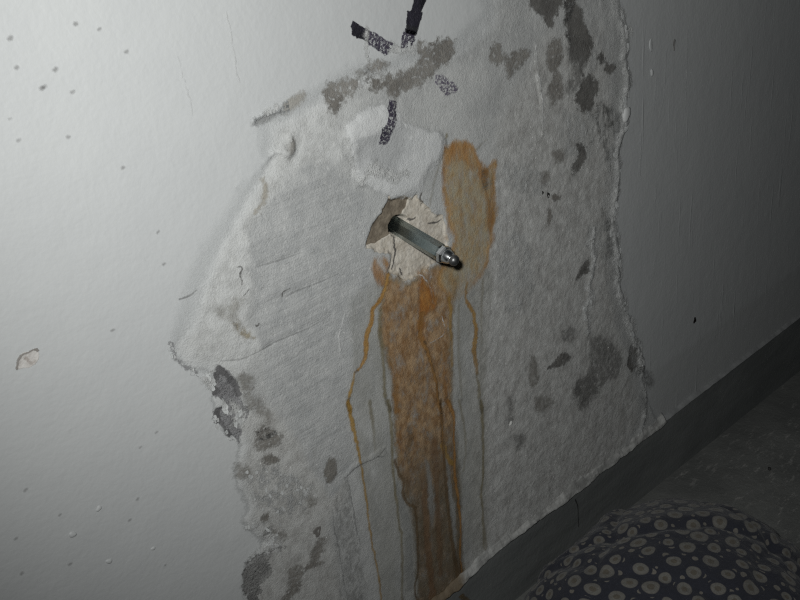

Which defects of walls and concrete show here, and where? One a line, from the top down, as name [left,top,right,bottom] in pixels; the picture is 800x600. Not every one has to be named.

water stain [323,38,455,114]
water stain [530,0,616,112]
water stain [573,143,586,172]
peeling [168,0,657,600]
peeling [16,348,39,370]
corrosion [347,142,496,600]
water stain [255,425,282,465]
water stain [283,538,324,600]